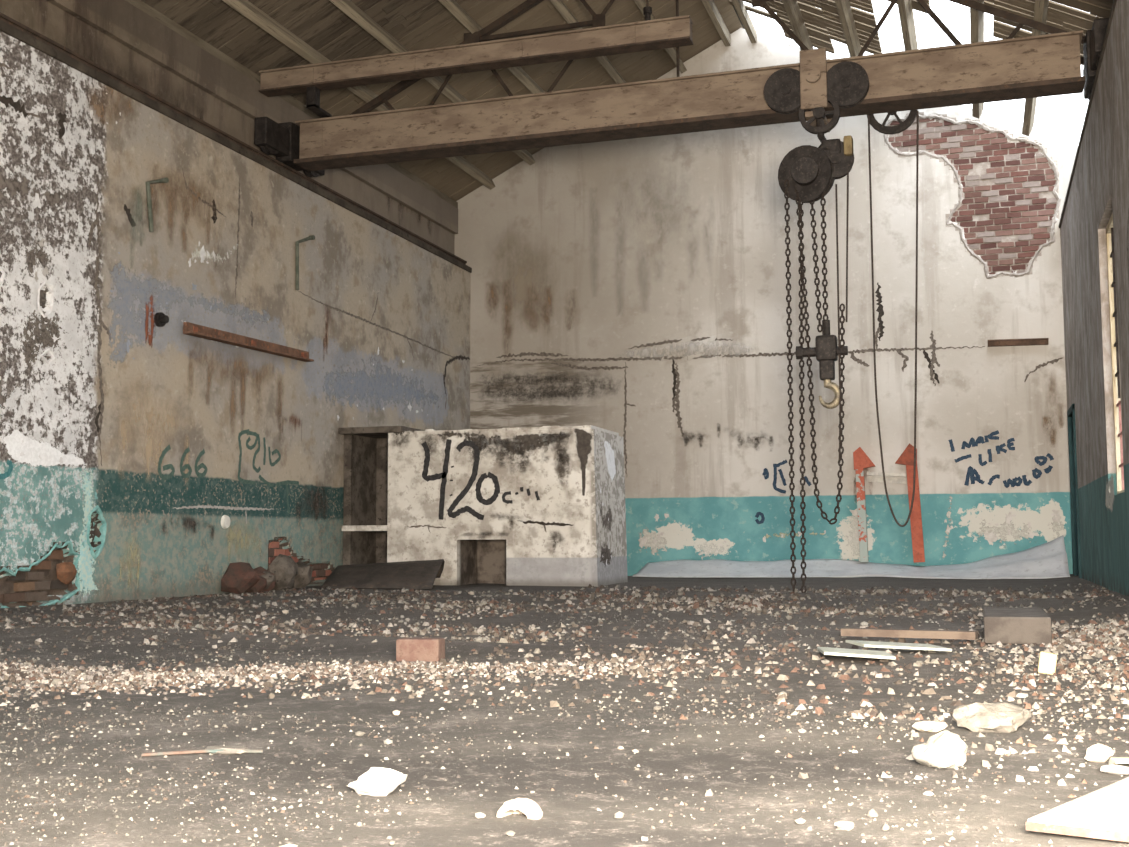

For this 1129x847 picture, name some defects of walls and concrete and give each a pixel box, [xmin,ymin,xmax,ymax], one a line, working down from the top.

peeling [0,173,66,209]
spalling [883,112,1061,279]
peeling [15,236,67,380]
spalling [0,428,107,608]
peeling [638,513,675,555]
peeling [977,509,1064,548]